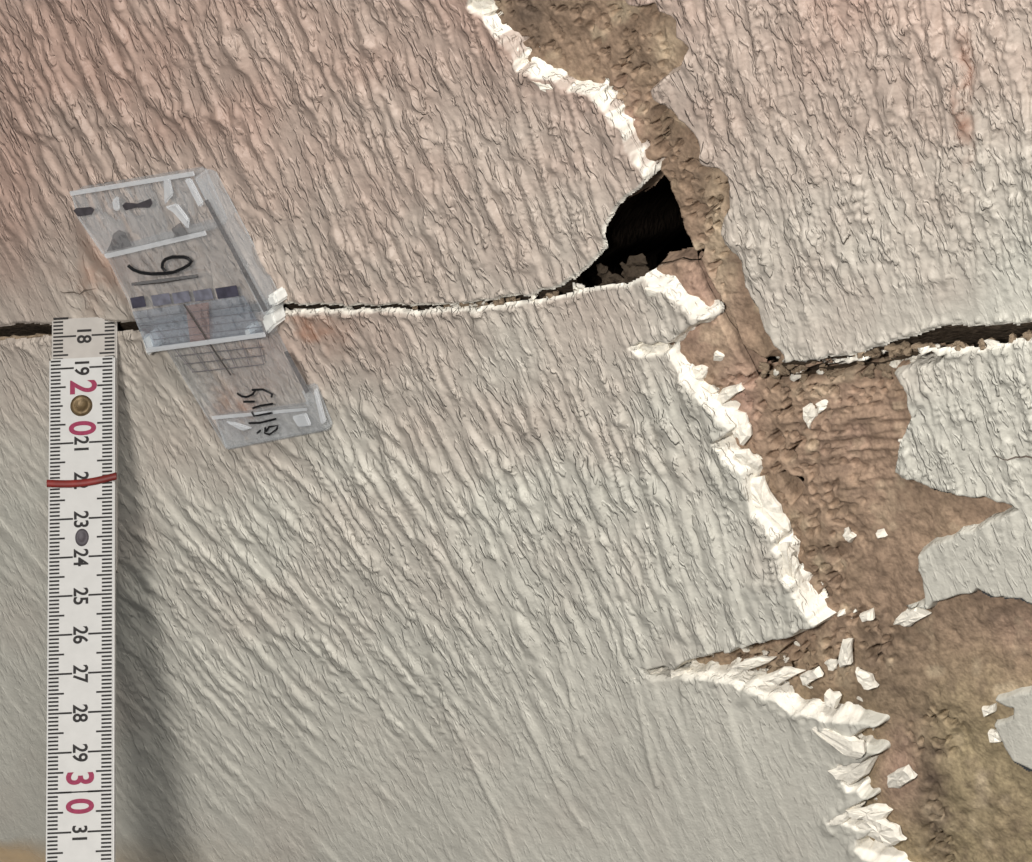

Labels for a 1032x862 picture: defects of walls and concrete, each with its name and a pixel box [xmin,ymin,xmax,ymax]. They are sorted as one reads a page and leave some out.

crack [0,323,52,340]
crack [118,275,593,333]
crack [709,286,1032,380]
spalling [472,0,1032,862]